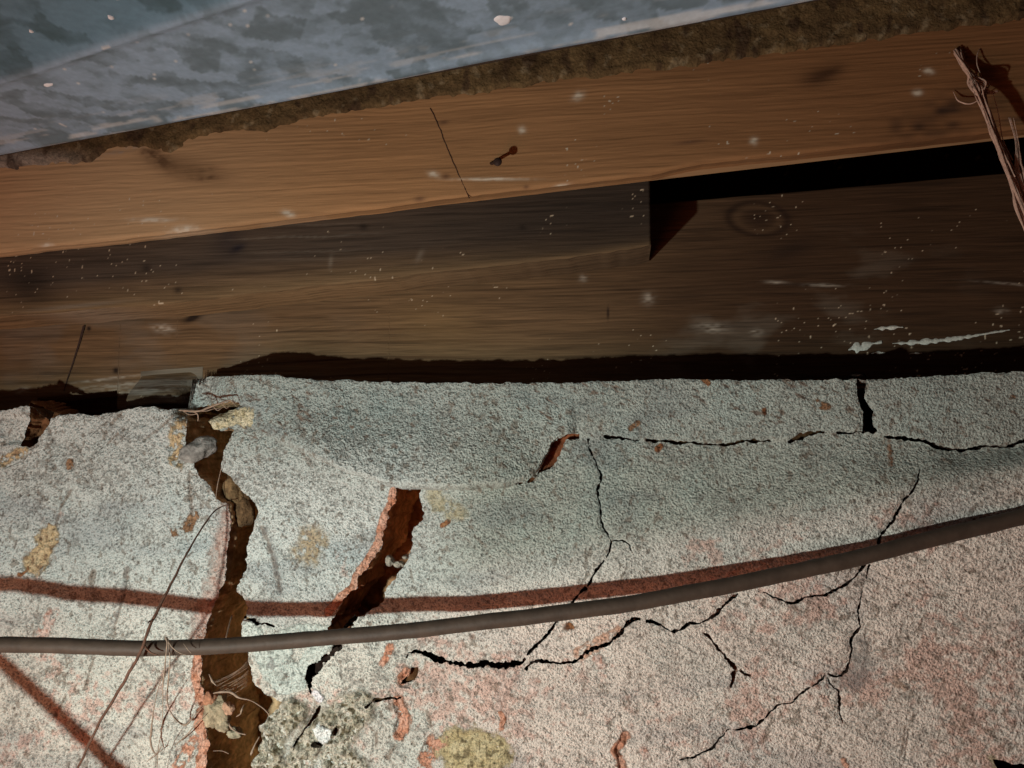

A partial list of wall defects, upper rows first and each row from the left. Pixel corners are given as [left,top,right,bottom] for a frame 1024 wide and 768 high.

crack [185,401,282,768]
rust [292,529,326,563]
crack [305,487,425,694]
spalling [518,434,580,485]
crack [406,371,1024,761]